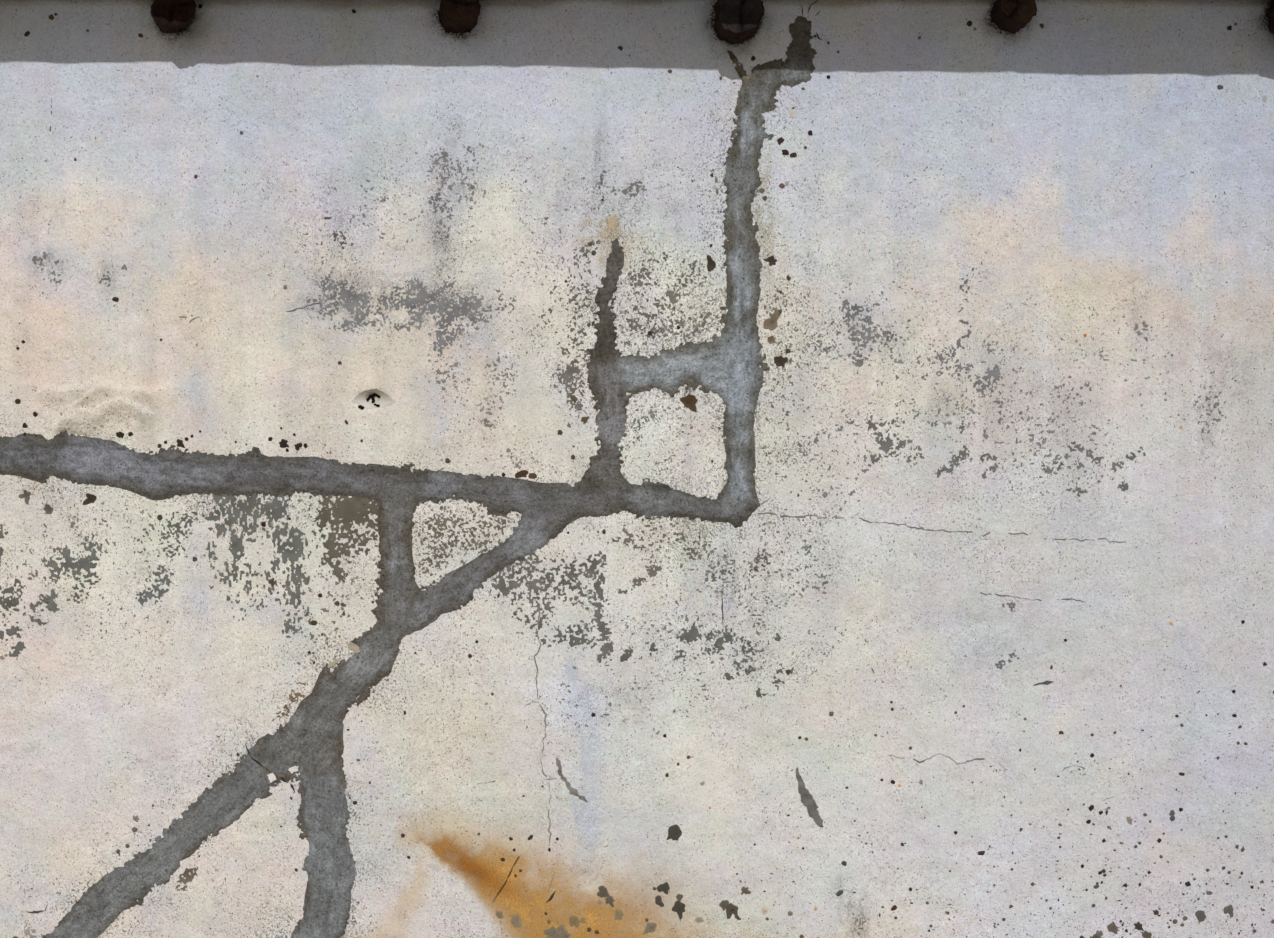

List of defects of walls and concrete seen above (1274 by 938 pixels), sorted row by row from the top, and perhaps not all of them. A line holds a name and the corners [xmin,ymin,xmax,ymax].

peeling [563,158,644,217]
peeling [304,126,601,469]
peeling [1170,359,1237,440]
peeling [490,252,1173,737]
peeling [0,493,380,668]
crack [245,744,295,793]
peeling [272,682,306,721]
crack [525,607,556,845]
rust [429,836,659,938]